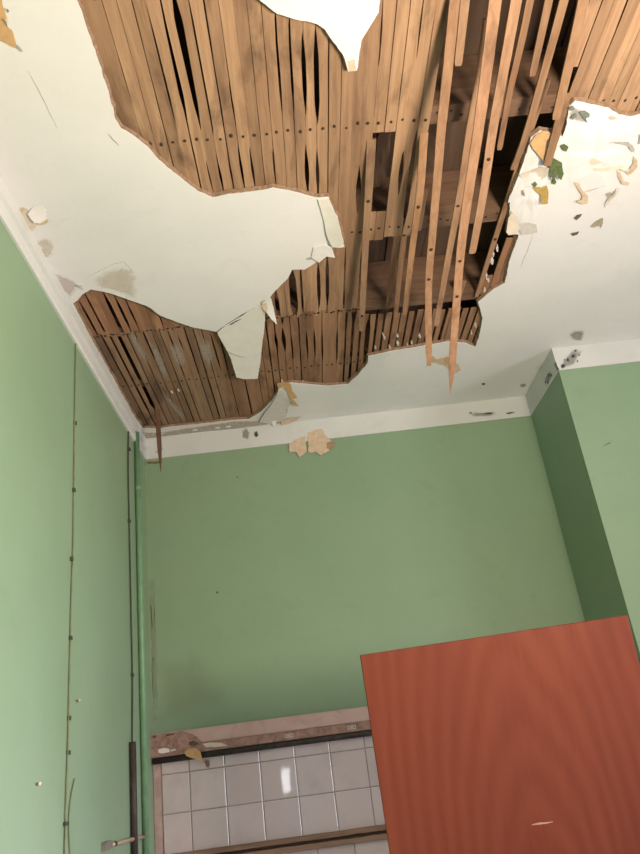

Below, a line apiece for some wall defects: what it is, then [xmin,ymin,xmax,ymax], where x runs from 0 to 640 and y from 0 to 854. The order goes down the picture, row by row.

peeling [0,0,23,52]
peeling [506,132,564,235]
peeling [306,244,335,262]
peeling [262,298,277,324]
peeling [431,356,461,374]
peeling [143,382,300,439]
spalling [289,429,335,457]
spalling [150,731,228,765]